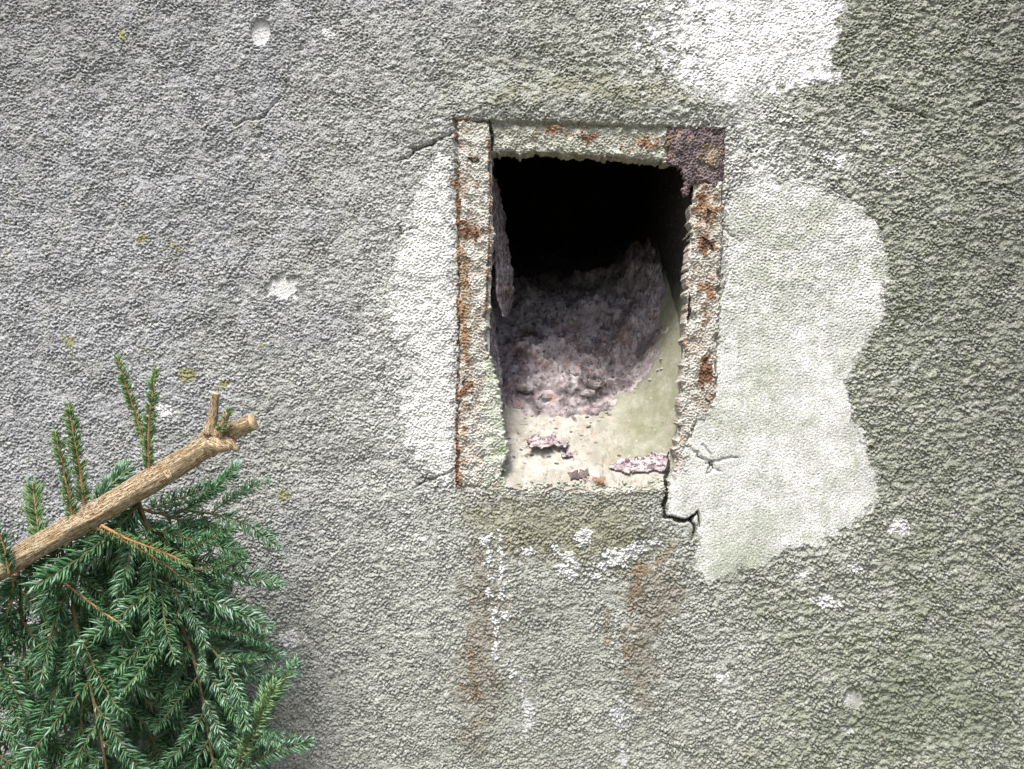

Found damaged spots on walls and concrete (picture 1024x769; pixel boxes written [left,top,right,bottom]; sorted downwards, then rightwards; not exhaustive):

crack [398,133,452,161]
rust [691,183,724,257]
spalling [265,272,300,302]
rust [449,141,491,487]
peeling [458,120,671,500]
peeling [674,181,725,471]
rust [697,275,720,327]
rust [687,351,718,390]
crack [661,452,700,533]
water stain [551,528,664,582]
water stain [478,529,537,735]
water stain [610,693,629,766]